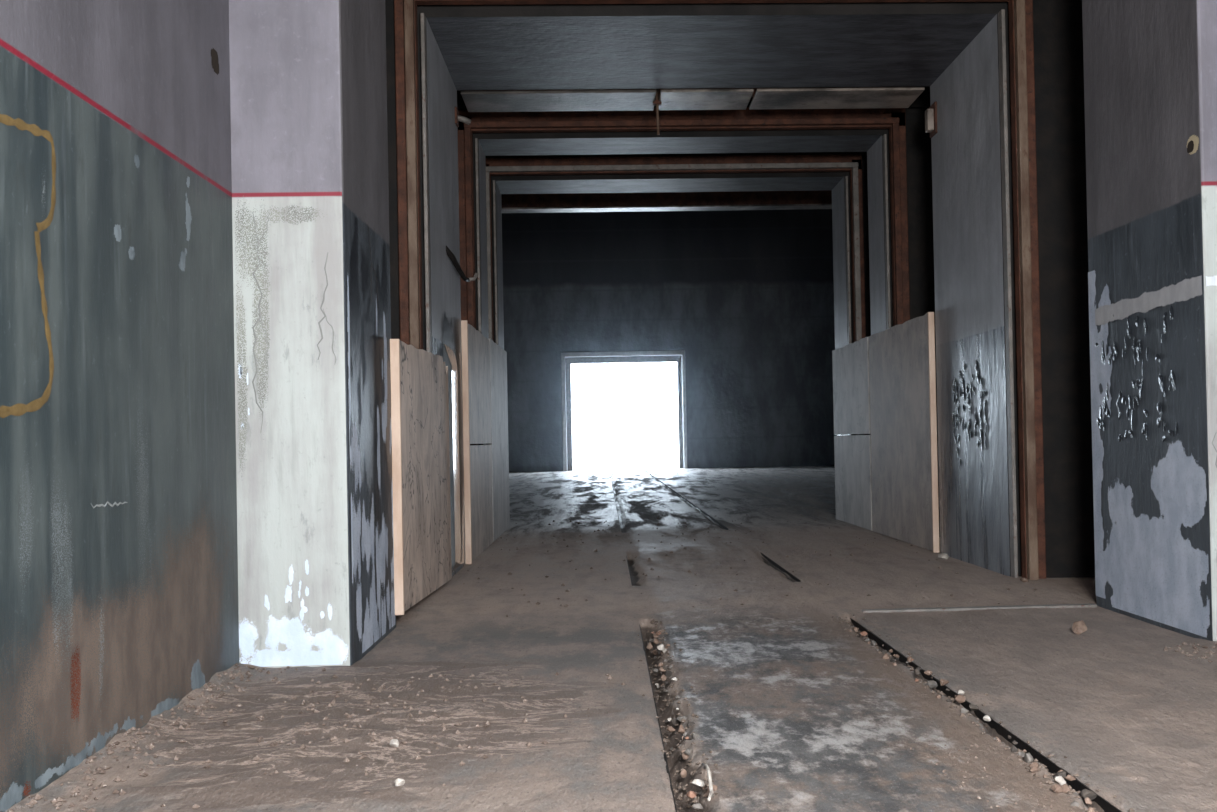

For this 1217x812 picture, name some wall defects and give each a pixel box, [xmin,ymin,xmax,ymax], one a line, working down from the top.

peeling [239,273,395,667]
water stain [347,217,392,505]
peeling [1088,270,1210,638]